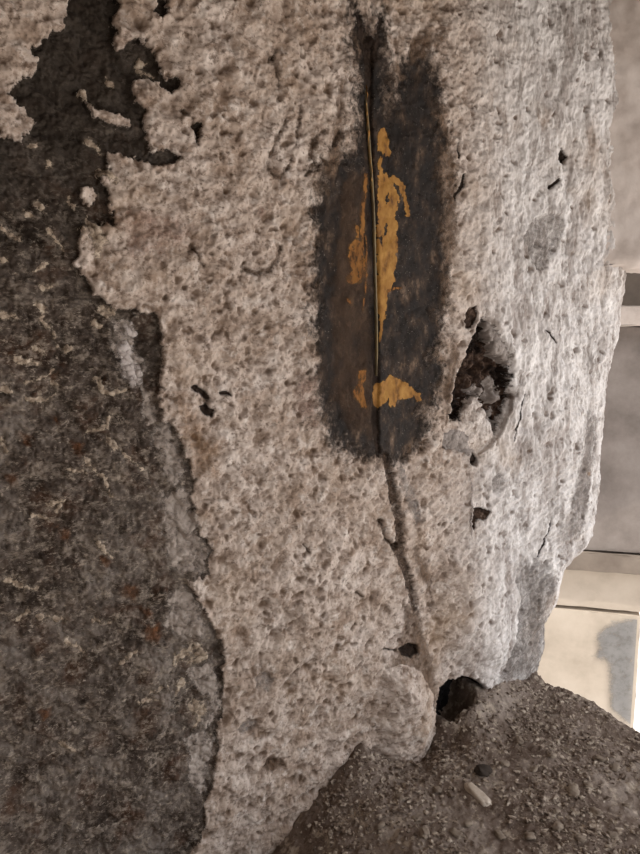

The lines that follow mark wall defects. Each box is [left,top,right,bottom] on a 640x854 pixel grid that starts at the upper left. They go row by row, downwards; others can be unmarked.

crack [353,11,382,230]
corrosion [347,85,410,342]
leakage [308,0,457,466]
flaking render [0,0,231,854]
corrosion [353,369,422,408]
crack [370,303,432,611]
spalling [442,306,519,465]
spalling [435,679,453,715]